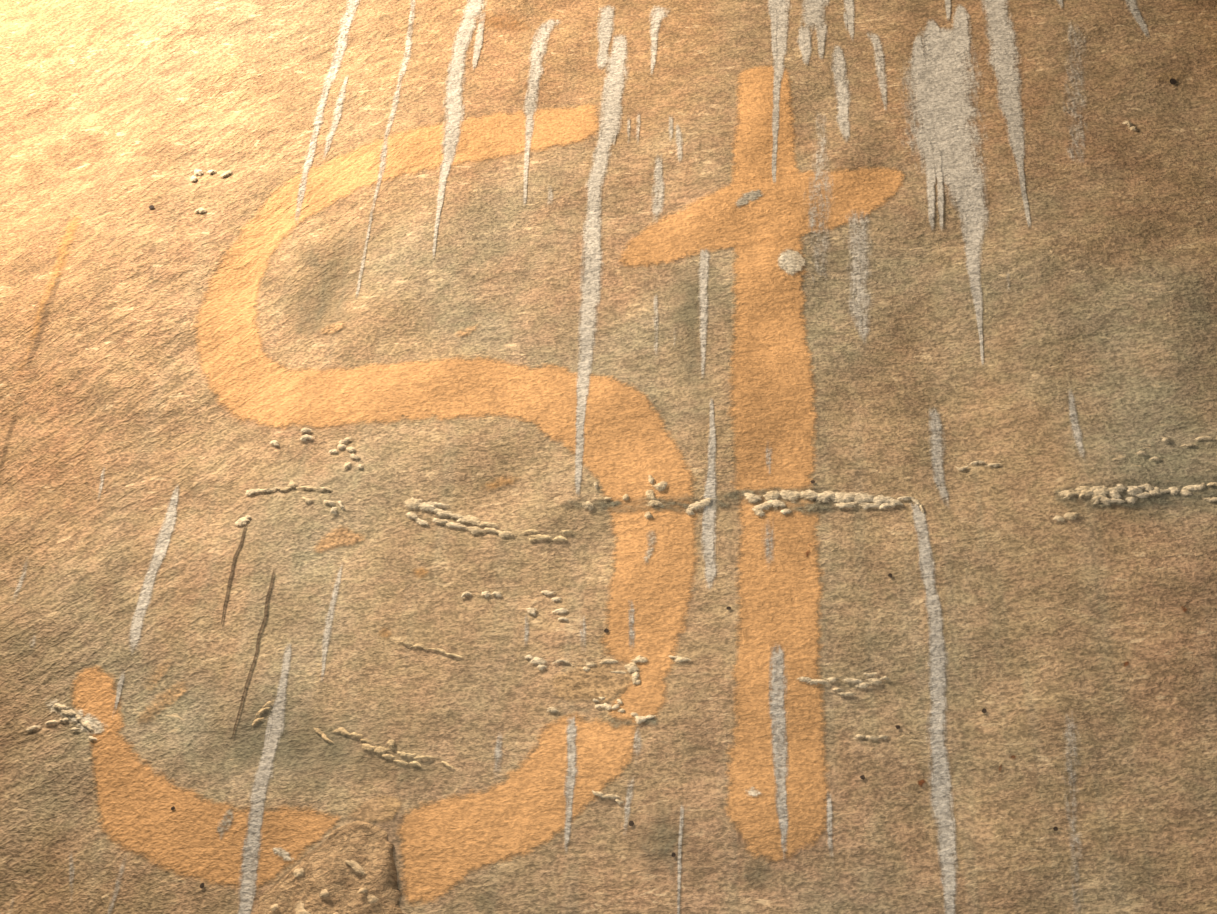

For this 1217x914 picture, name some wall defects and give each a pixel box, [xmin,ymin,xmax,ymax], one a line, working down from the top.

leakage [295,0,359,219]
leakage [433,0,486,255]
leakage [524,20,558,203]
leakage [575,6,640,492]
leakage [650,7,669,73]
leakage [683,250,710,374]
leakage [768,0,849,182]
leakage [905,0,988,364]
leakage [982,0,1031,226]
leakage [130,489,178,649]
leakage [238,644,299,914]
leakage [911,503,956,914]